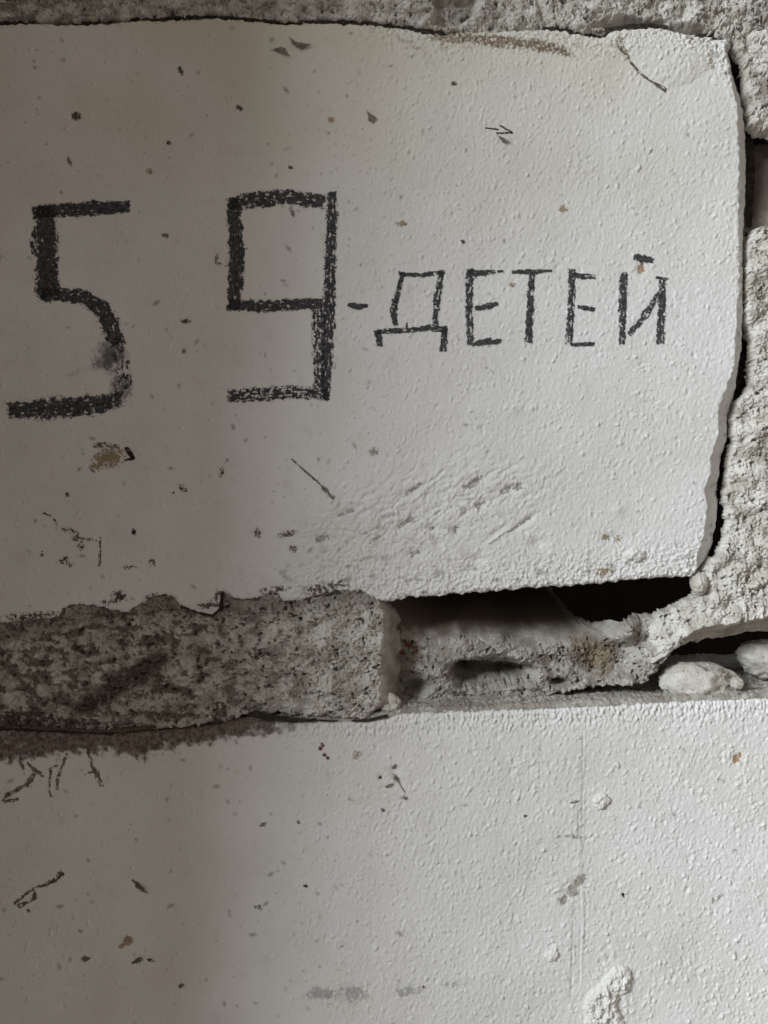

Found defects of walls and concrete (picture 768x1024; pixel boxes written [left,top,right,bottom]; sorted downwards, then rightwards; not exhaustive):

crack [696,33,741,92]
crack [745,132,756,237]
crack [733,327,748,401]
crack [700,437,730,565]
spalling [388,586,691,700]